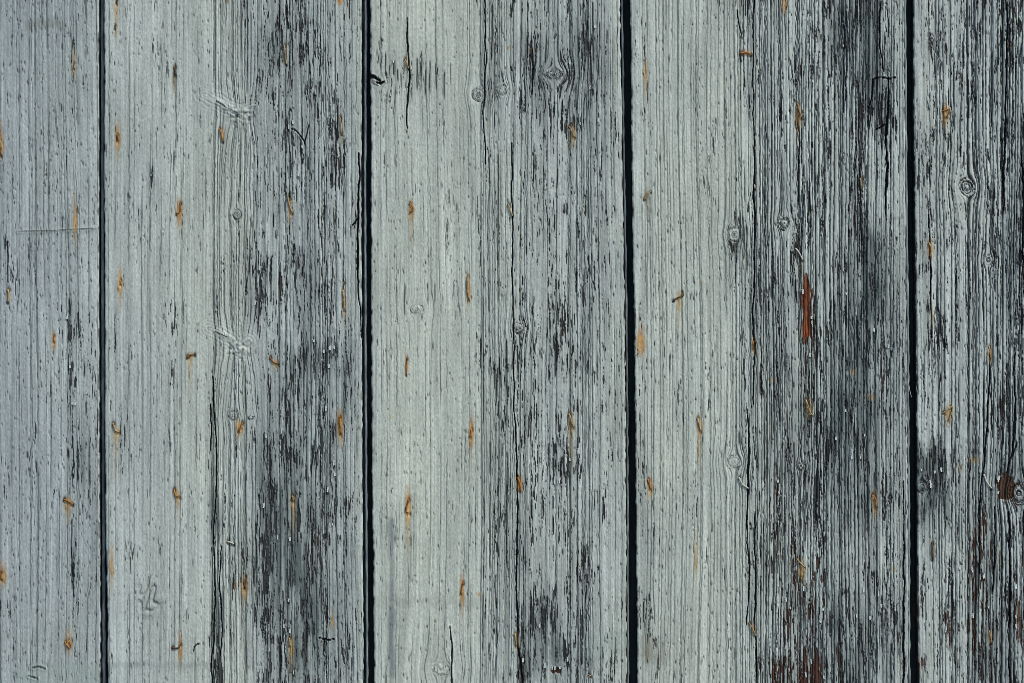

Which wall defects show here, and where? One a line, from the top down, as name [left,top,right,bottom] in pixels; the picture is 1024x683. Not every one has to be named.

peeling [569,0,607,128]
peeling [800,273,813,361]
peeling [829,214,906,366]
peeling [241,334,345,678]
peeling [548,434,580,499]
peeling [806,378,886,518]
peeling [917,439,948,507]
peeling [995,472,1016,503]
peeling [518,577,587,673]
peeling [772,549,898,683]
peeling [959,510,1024,660]